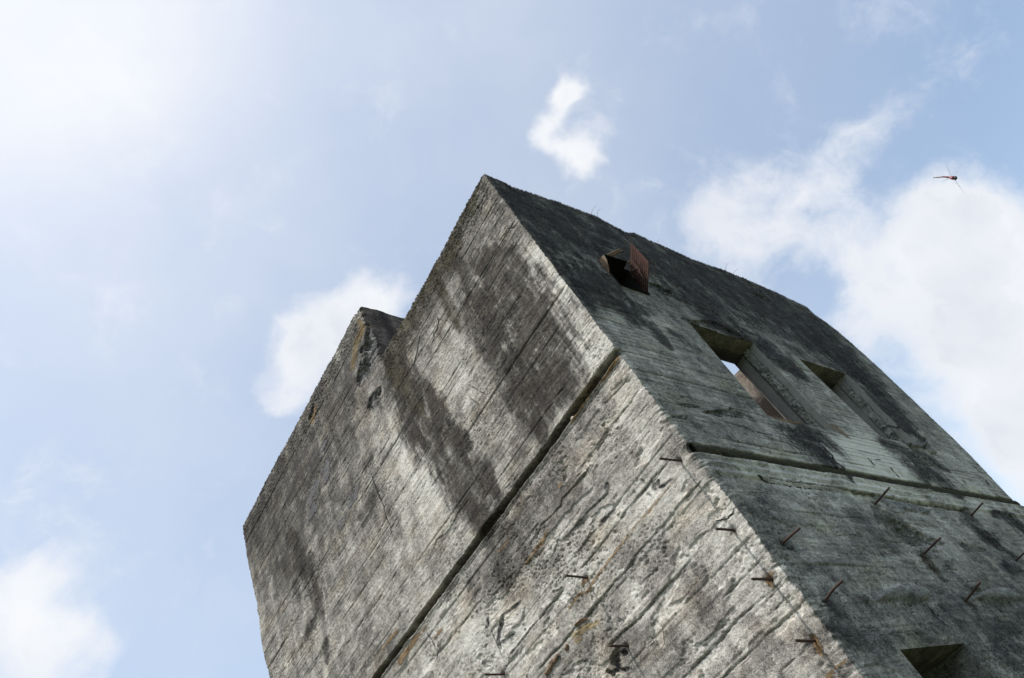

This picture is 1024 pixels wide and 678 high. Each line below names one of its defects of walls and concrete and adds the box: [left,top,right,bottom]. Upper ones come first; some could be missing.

water stain [363,348,501,539]
water stain [435,173,1024,573]